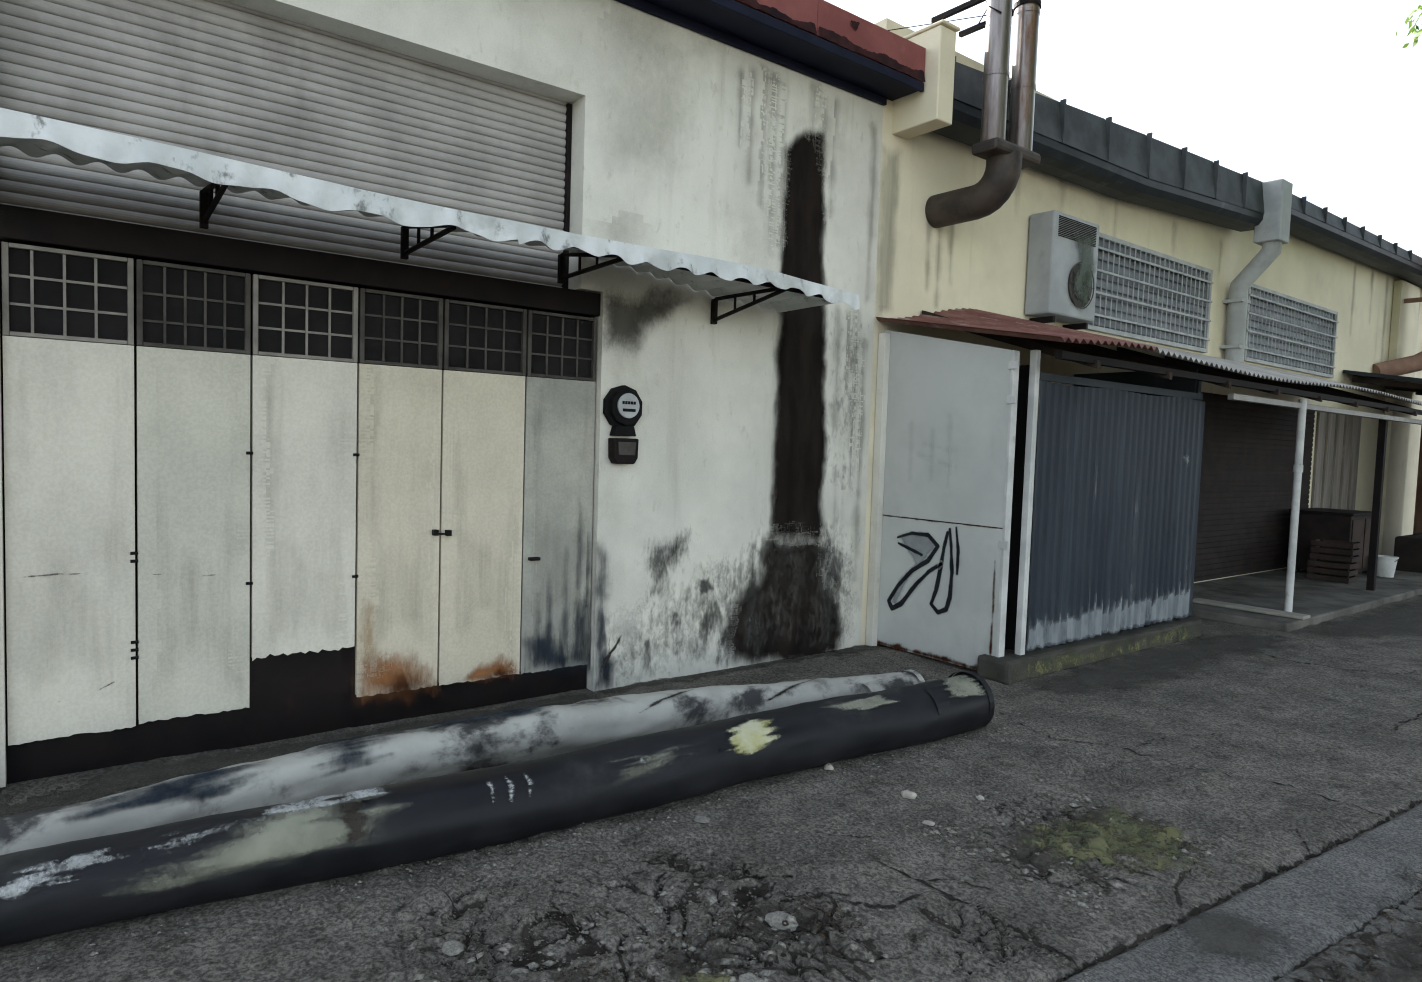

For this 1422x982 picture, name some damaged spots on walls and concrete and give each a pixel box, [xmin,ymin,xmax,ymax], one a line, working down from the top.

water stain [650,539,683,583]
water stain [545,559,613,687]
water stain [700,580,730,663]
rust [363,659,423,695]
rust [468,661,515,680]
crack [602,638,620,668]
crack [400,723,1422,982]